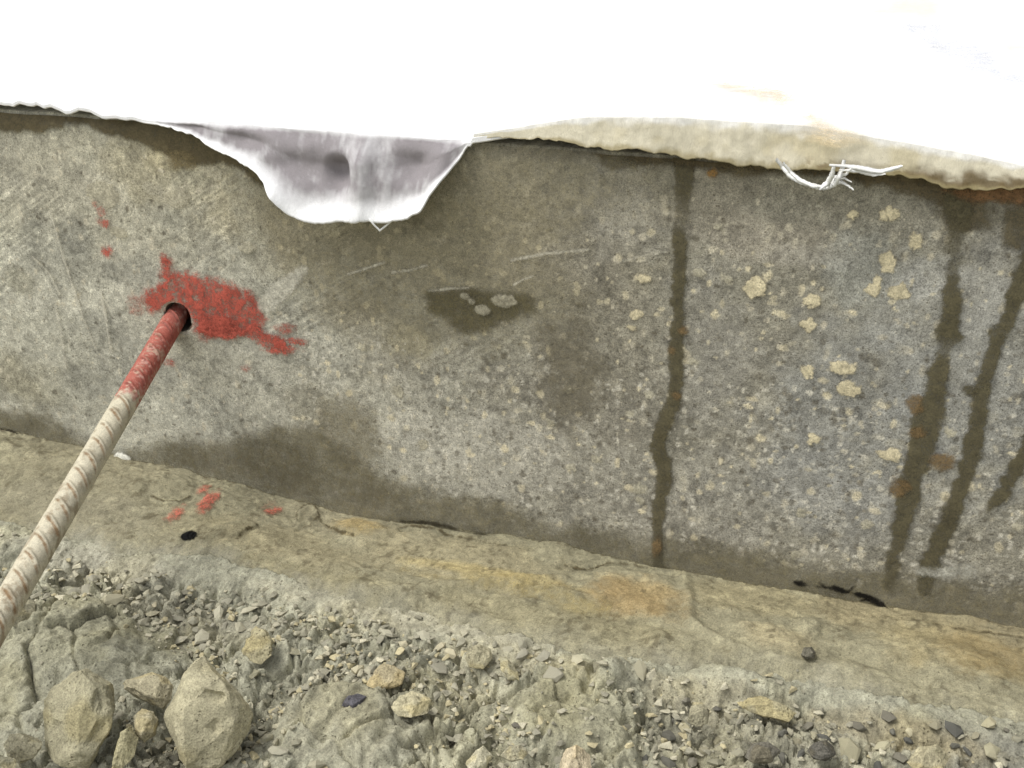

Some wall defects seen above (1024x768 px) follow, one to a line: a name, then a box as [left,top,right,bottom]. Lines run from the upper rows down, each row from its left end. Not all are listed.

water stain [126,151,1024,629]
water stain [0,414,86,447]
crack [794,581,888,608]